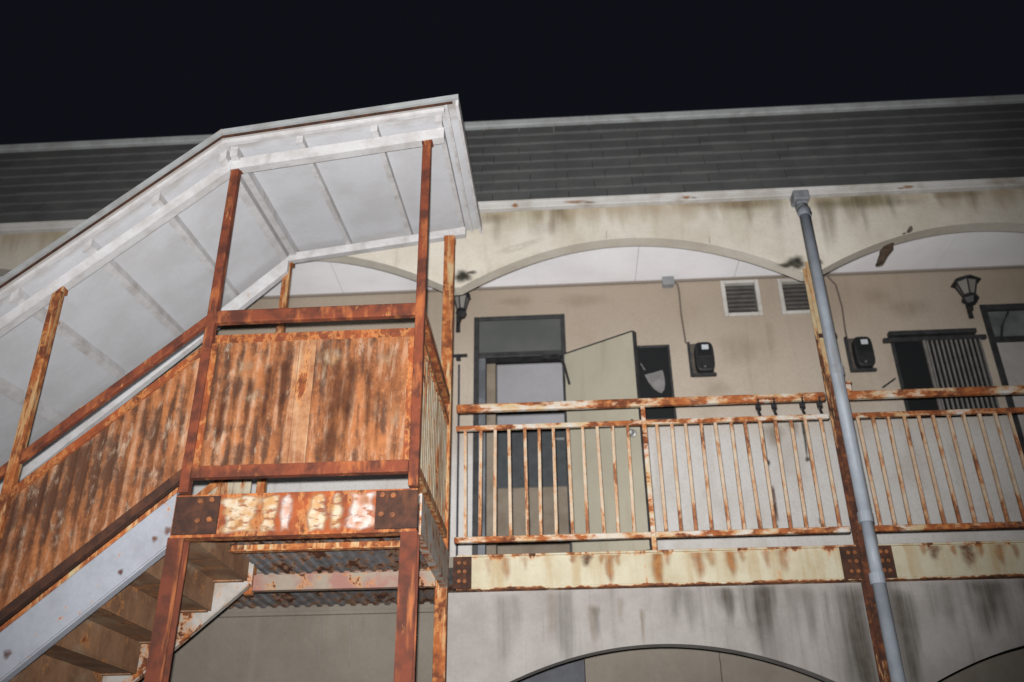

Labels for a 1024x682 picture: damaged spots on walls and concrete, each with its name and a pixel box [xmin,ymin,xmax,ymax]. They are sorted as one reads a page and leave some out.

corrosion [247,363,287,419]
corrosion [331,364,370,417]
corrosion [325,431,336,452]
peeling [222,495,292,533]
peeling [307,493,375,530]
leakage [852,595,874,682]